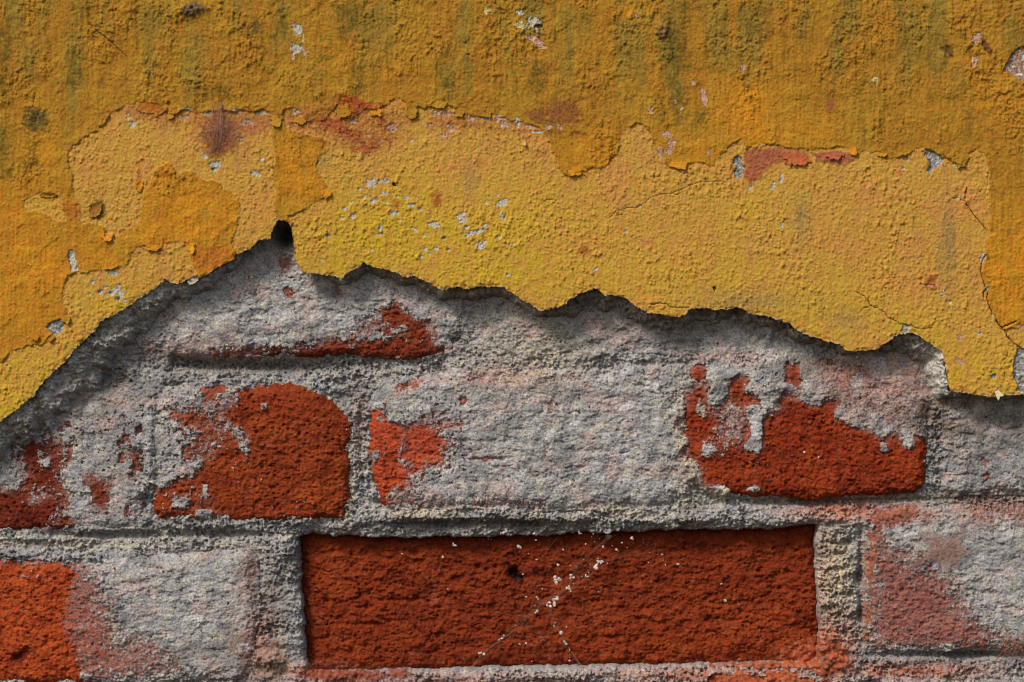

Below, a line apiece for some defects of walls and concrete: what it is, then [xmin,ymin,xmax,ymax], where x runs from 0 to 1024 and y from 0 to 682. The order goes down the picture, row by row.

peeling [971,30,992,67]
peeling [690,80,709,106]
peeling [0,98,1024,462]
crack [980,263,1023,350]
spalling [508,567,524,582]